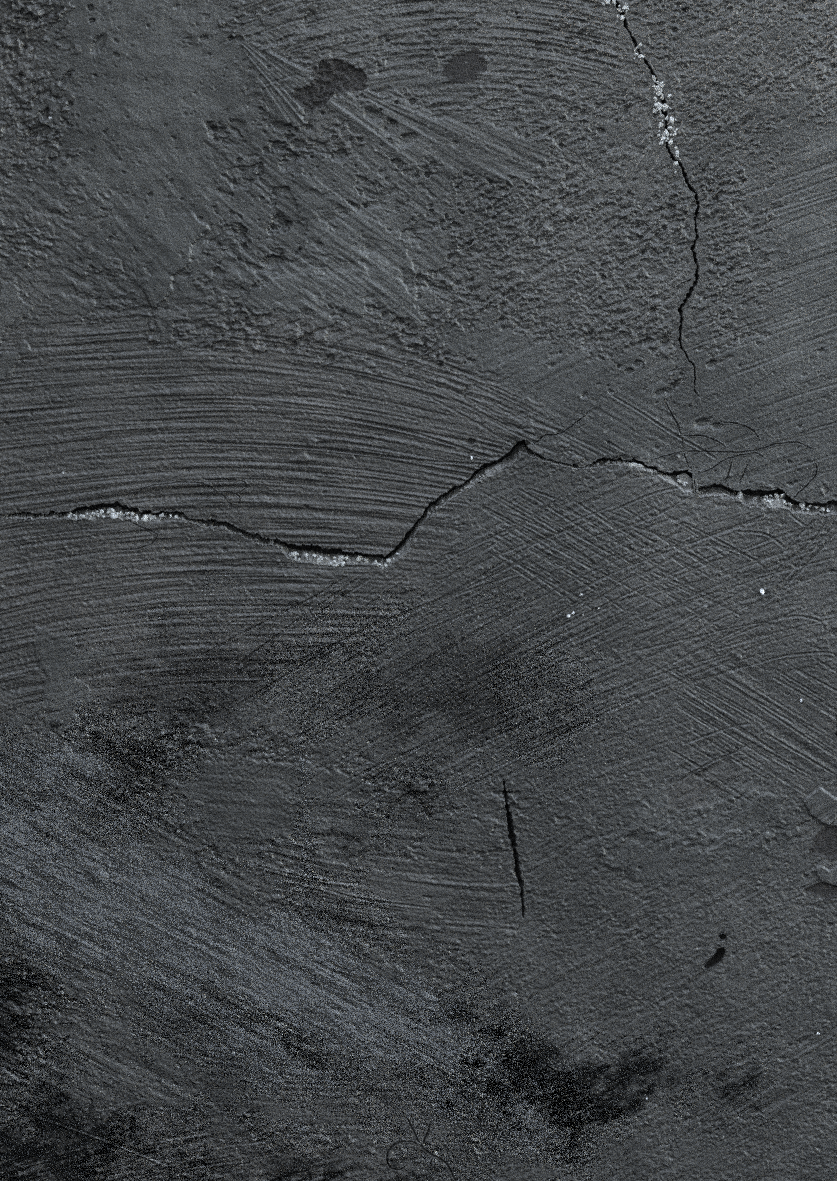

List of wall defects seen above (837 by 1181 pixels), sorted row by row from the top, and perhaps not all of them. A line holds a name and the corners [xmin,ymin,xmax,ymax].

crack [0,0,837,570]
crack [385,1117,458,1181]